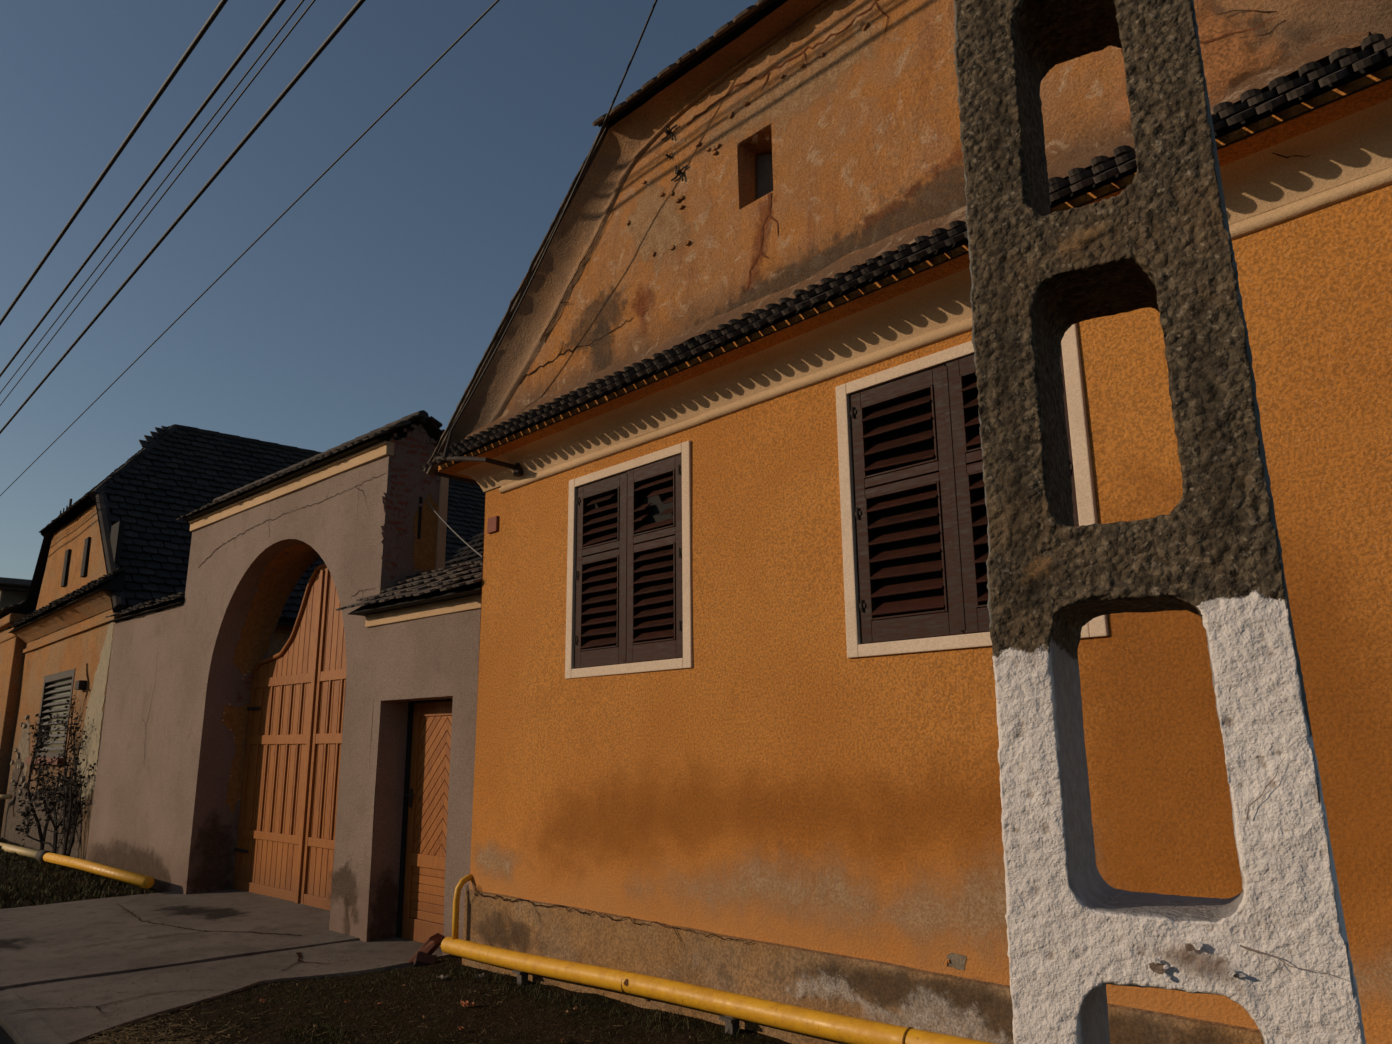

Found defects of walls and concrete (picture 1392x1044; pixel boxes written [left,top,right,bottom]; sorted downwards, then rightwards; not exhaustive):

crack [687,0,889,125]
crack [519,204,633,384]
water stain [564,289,626,370]
water stain [690,166,967,341]
spalling [380,424,440,580]
peeling [233,544,319,674]
water stain [329,867,398,940]
water stain [787,967,1013,1044]
water stain [892,871,1007,935]
spalling [943,953,966,970]